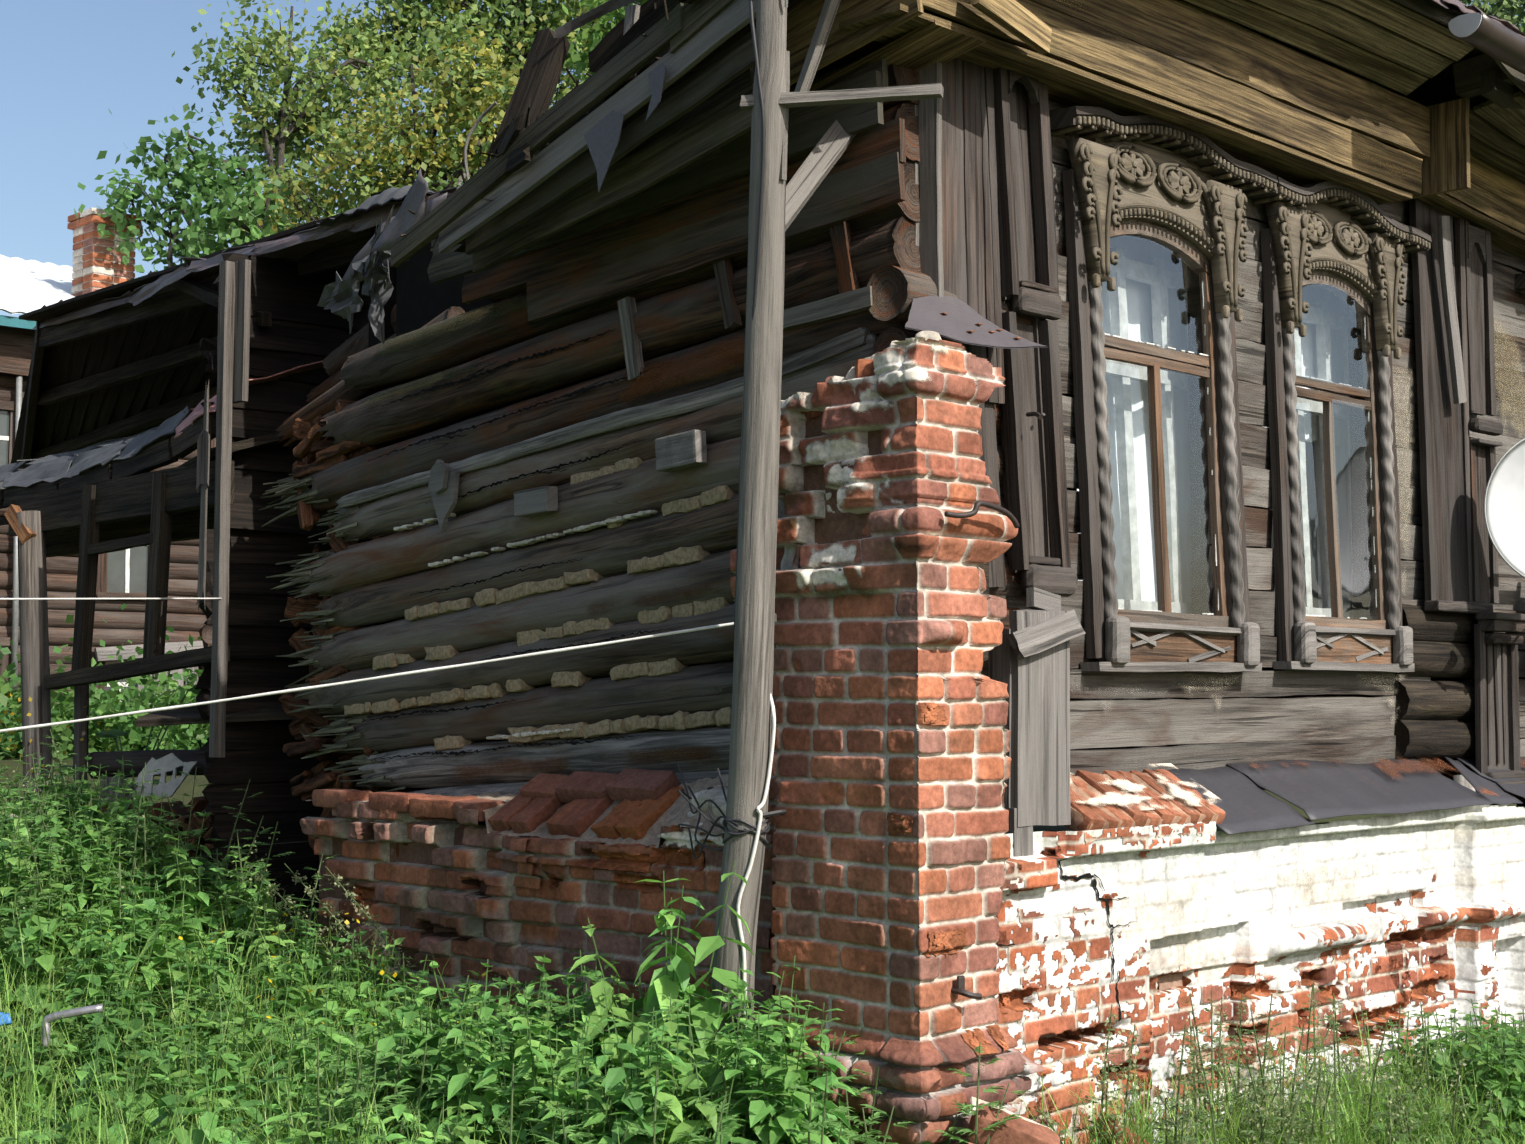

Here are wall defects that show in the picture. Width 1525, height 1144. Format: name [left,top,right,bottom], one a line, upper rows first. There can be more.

crack [1058,858,1136,1021]
peeling [961,823,1524,1144]